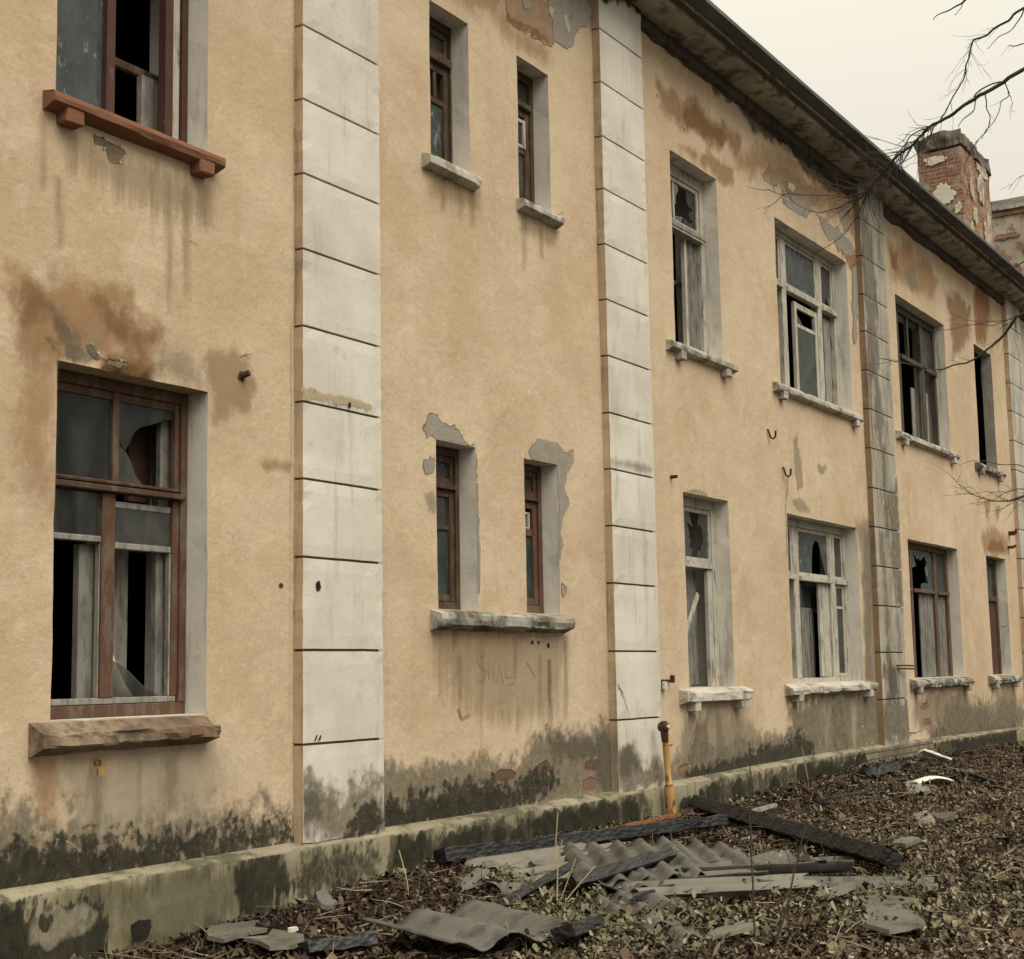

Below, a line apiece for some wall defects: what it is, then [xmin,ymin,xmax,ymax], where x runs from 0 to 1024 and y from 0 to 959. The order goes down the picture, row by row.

peeling [505,0,592,48]
flaking render [93,134,128,164]
water stain [657,82,741,184]
peeling [762,163,856,257]
water stain [21,277,158,369]
flaking render [86,342,128,368]
peeling [301,386,372,410]
peeling [423,413,481,594]
peeling [529,438,574,559]
water stain [888,481,904,612]
water stain [0,664,910,890]